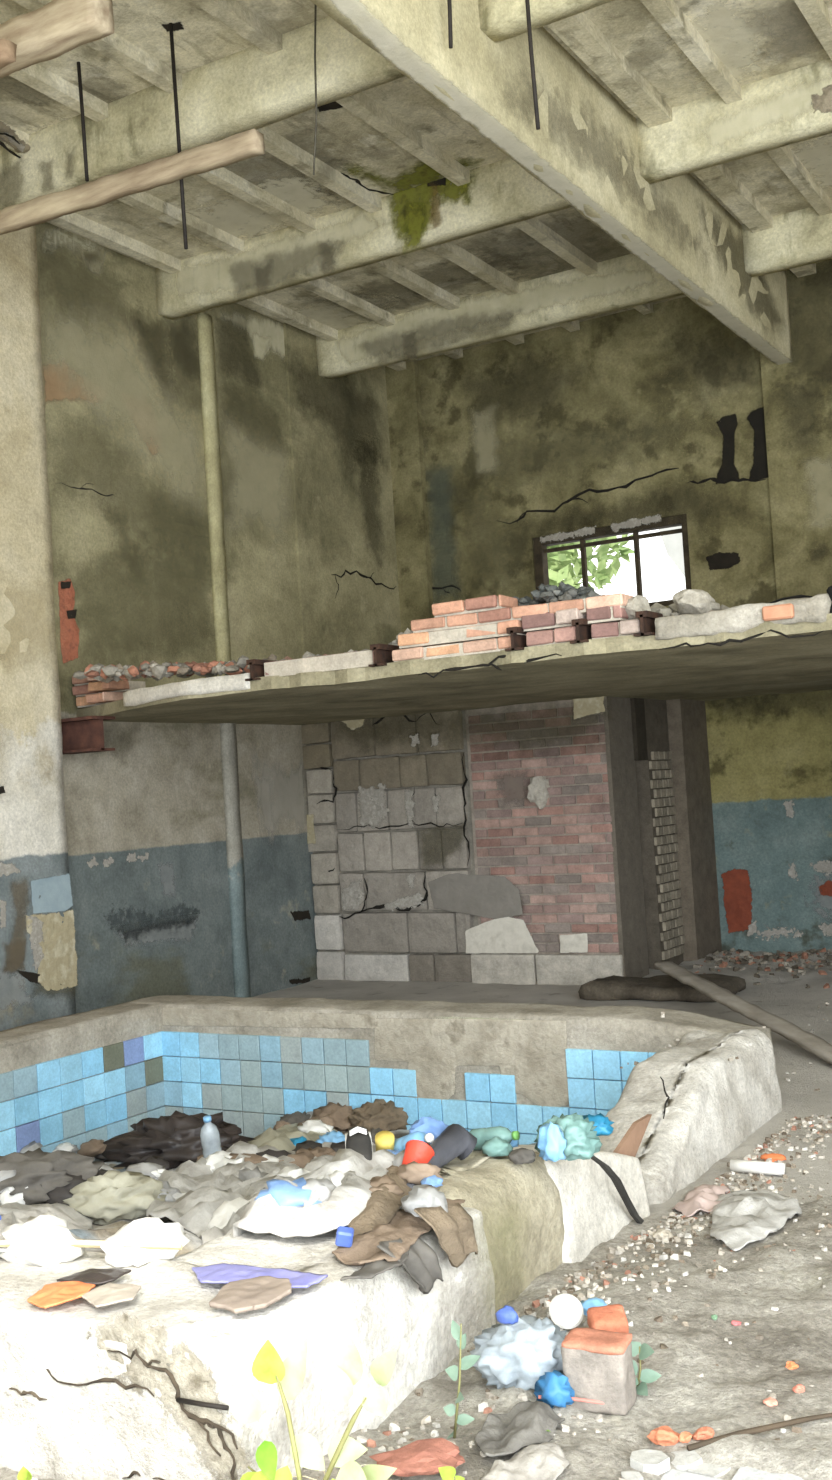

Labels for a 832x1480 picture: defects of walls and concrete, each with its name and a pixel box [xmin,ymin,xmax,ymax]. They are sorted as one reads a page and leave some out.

water stain [405,188,440,250]
crack [496,468,766,524]
peeling [573,696,605,719]
peeling [87,852,149,868]
peeling [788,860,832,897]
flaking render [721,868,832,941]
flaking render [0,862,78,991]
peeling [465,917,539,954]
peeling [560,933,588,953]
crack [660,1077,670,1119]
crack [9,1349,238,1480]